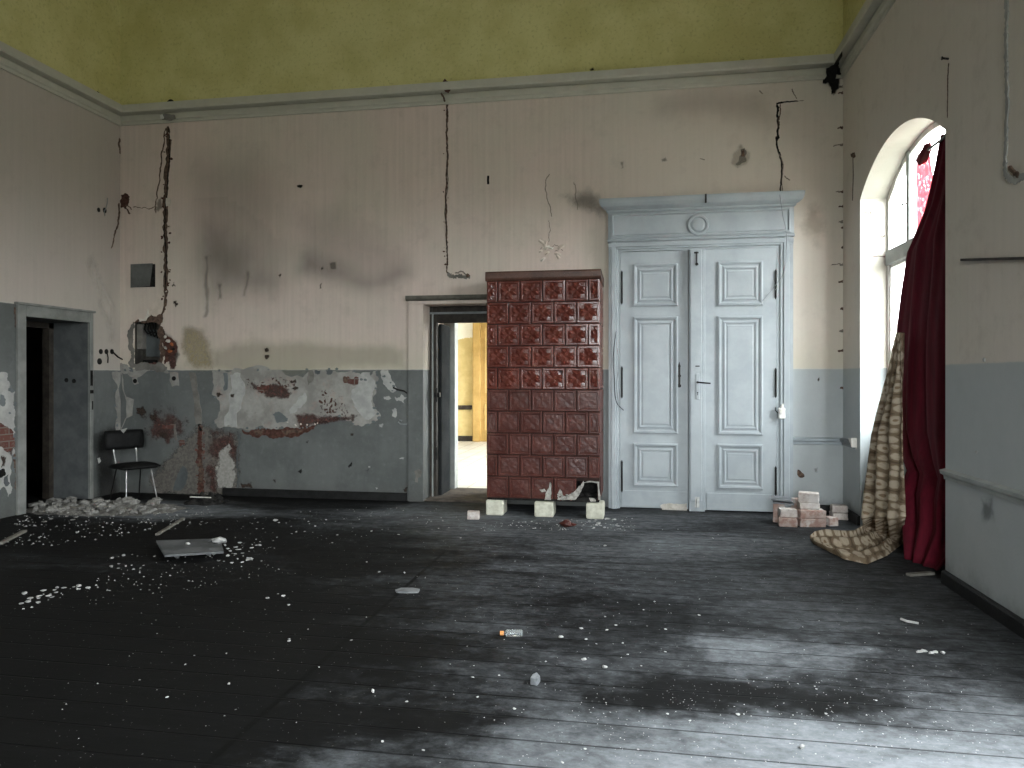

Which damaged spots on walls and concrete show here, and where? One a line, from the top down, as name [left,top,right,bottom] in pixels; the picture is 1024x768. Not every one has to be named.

crack [111,126,173,316]
crack [441,93,470,279]
crack [775,100,804,191]
peeling [0,372,17,496]
peeling [112,309,407,495]
spalling [540,481,601,502]